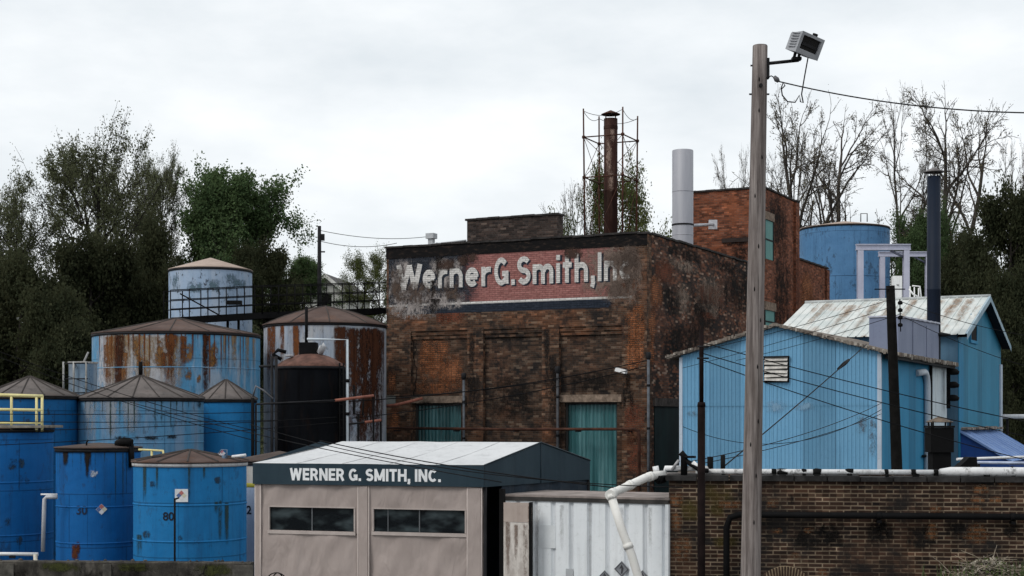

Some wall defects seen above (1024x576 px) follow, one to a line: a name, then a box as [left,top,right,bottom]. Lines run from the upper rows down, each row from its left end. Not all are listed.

peeling [437,253,477,270]
spalling [172,275,246,292]
peeling [391,269,457,304]
rust [99,325,300,387]
rust [334,327,384,442]